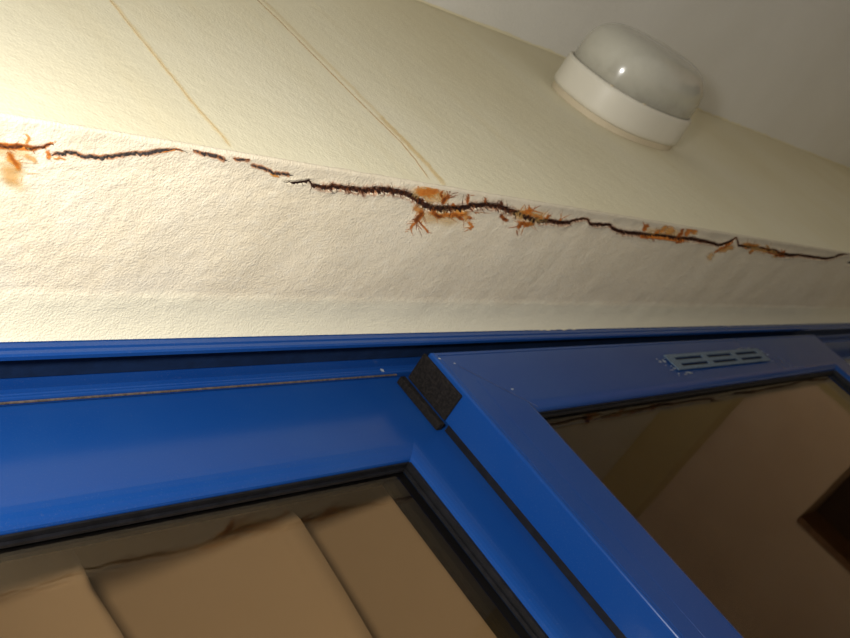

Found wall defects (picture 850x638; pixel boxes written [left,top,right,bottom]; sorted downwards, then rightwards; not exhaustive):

corrosion [0,134,36,180]
crack [0,144,850,263]
corrosion [406,186,487,236]
corrosion [499,199,569,235]
corrosion [640,222,697,244]